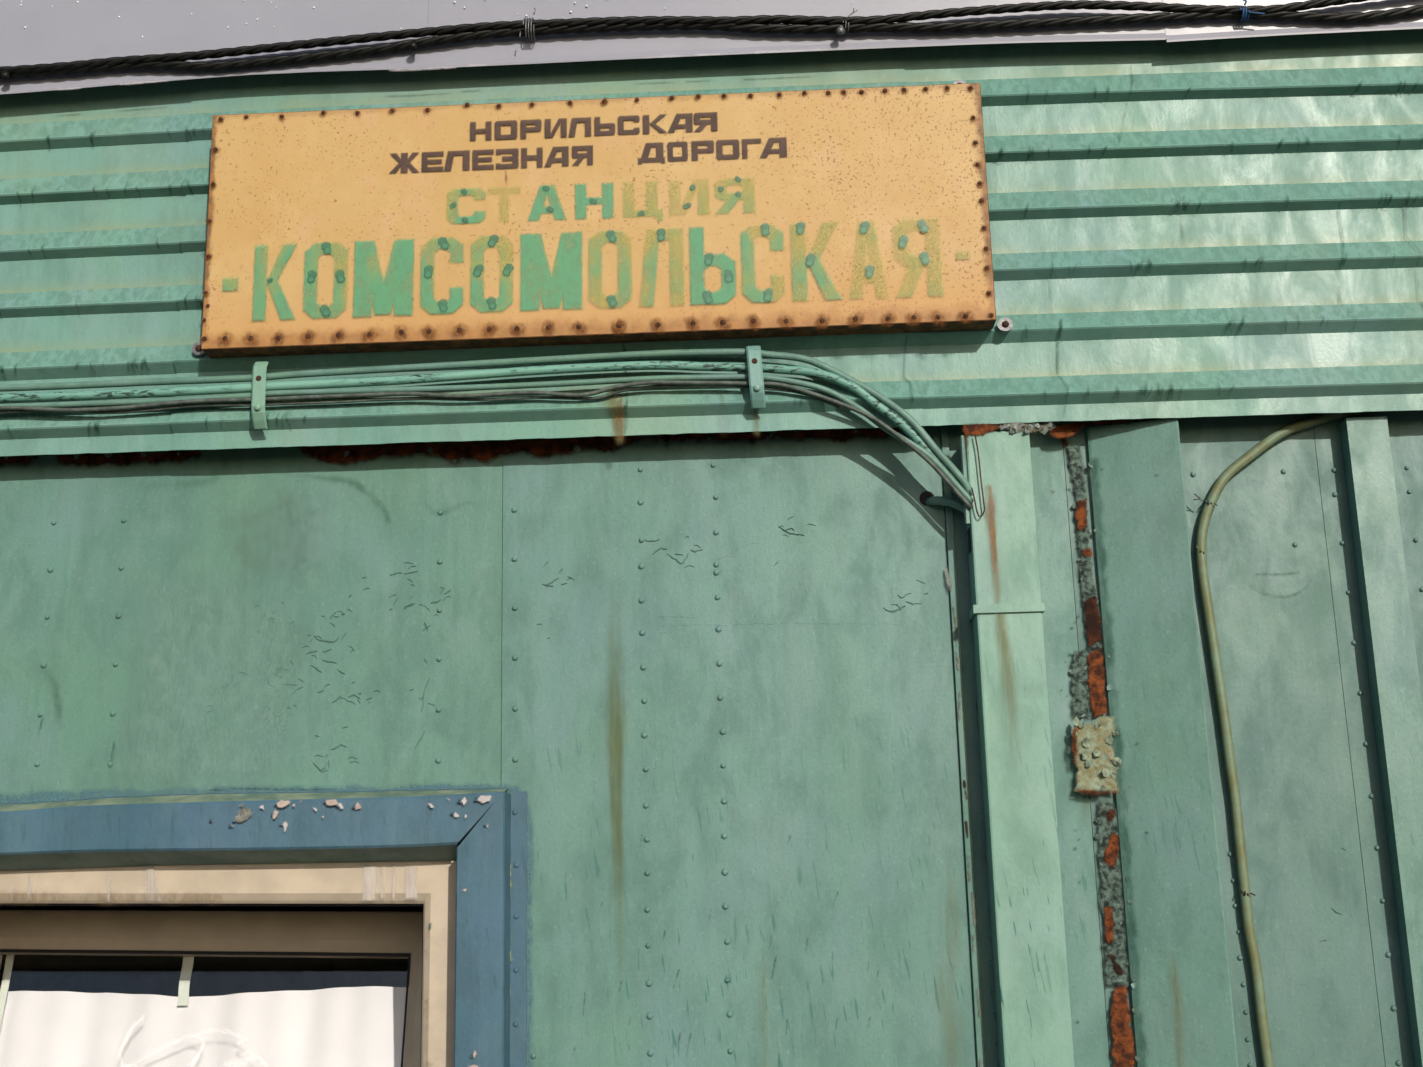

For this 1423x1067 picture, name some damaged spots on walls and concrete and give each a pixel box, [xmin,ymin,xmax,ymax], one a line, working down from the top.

corrosion [1050,419,1151,457]
corrosion [0,456,37,466]
corrosion [56,450,201,467]
corrosion [989,494,997,570]
corrosion [1075,499,1087,530]
corrosion [1084,596,1107,717]
peeling [209,800,295,832]
peeling [314,799,361,818]
corrosion [1104,810,1119,867]
corrosion [1104,906,1136,1067]